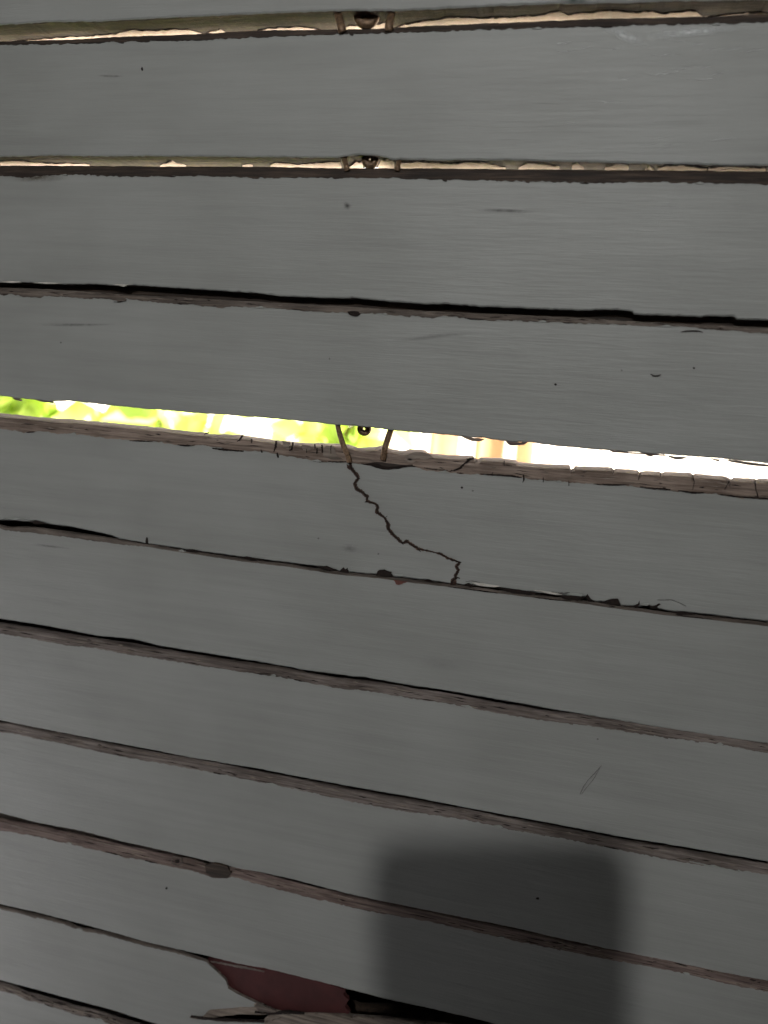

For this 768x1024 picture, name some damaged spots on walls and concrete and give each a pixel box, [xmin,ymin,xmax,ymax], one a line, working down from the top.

crack [237,435,462,585]
spalling [0,908,421,1024]
peeling [0,821,768,992]